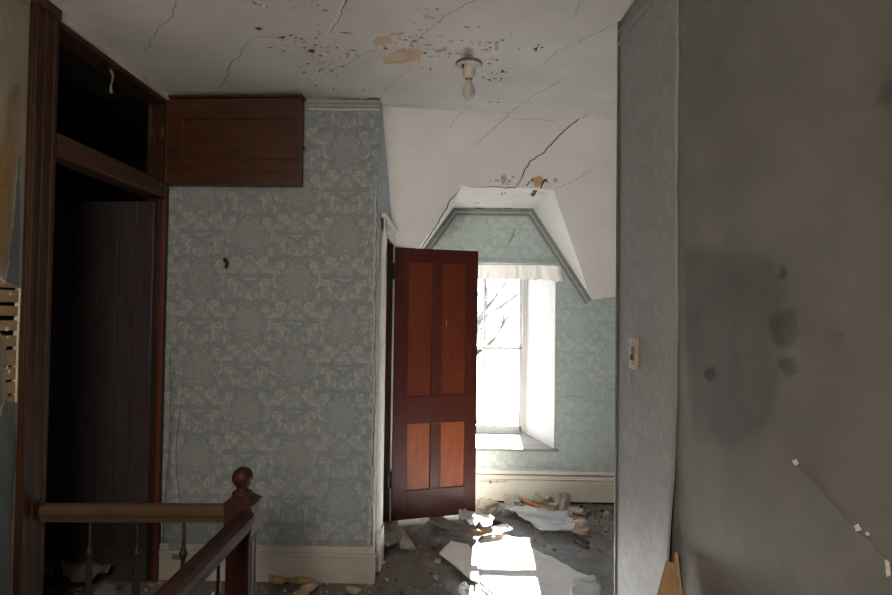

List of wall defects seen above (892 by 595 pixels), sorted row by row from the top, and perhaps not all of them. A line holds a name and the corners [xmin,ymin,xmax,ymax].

peeling [370,9,543,81]
crack [420,73,598,250]
peeling [0,150,21,595]